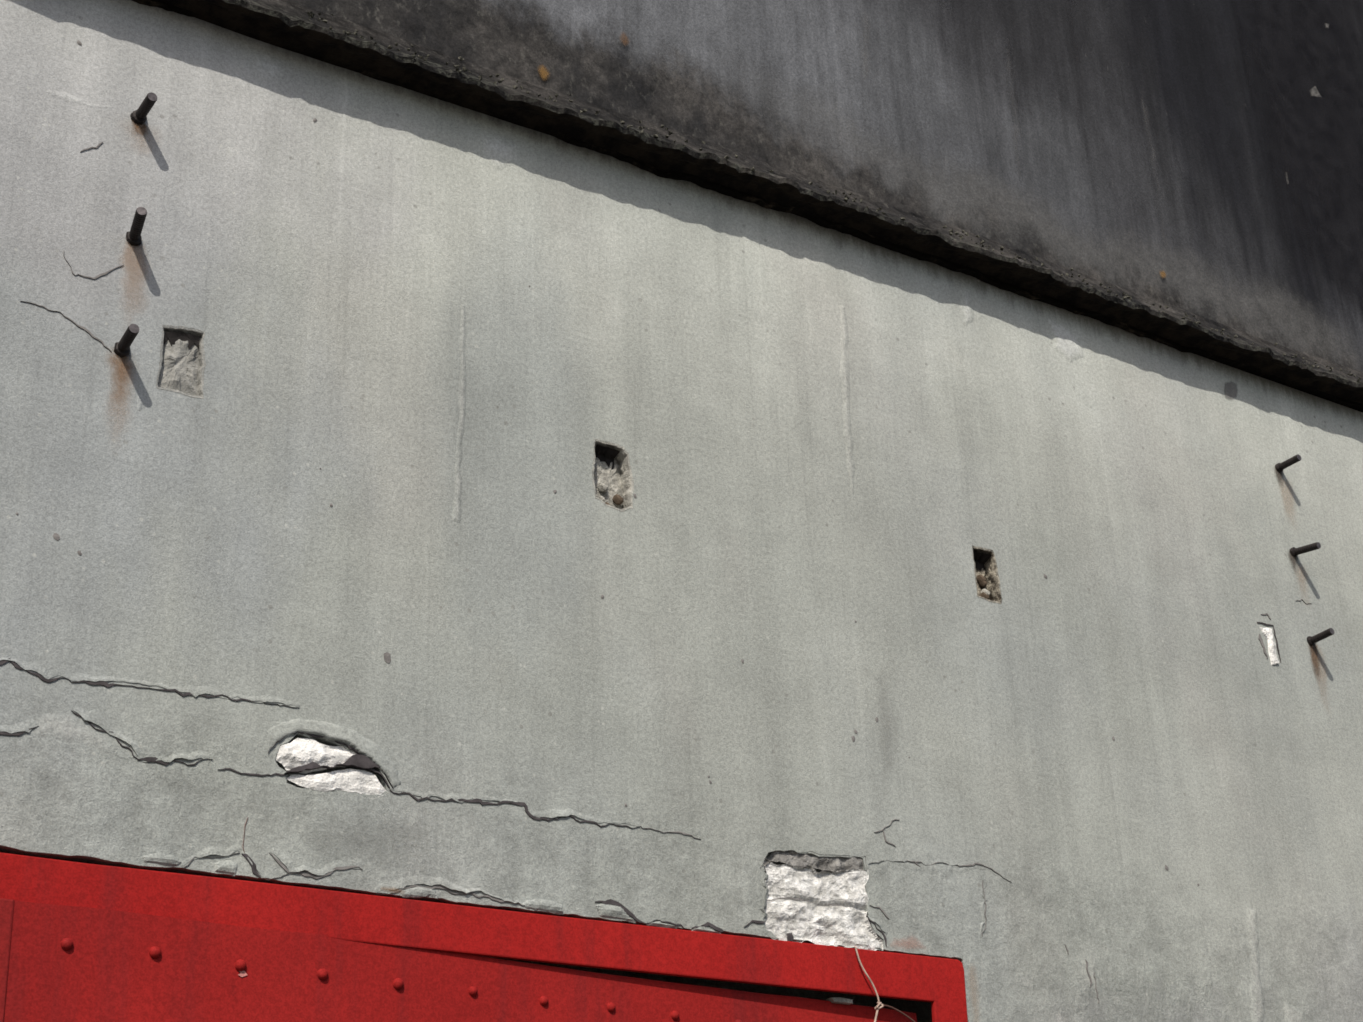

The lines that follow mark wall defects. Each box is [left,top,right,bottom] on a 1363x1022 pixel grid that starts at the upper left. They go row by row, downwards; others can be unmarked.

damp [252,53,292,84]
damp [473,131,521,171]
damp [1243,0,1363,310]
crack [63,253,124,280]
crack [21,301,112,353]
damp [1044,314,1084,363]
damp [1225,382,1237,399]
corrosion [1310,644,1318,667]
crack [0,658,300,776]
crack [390,786,699,839]